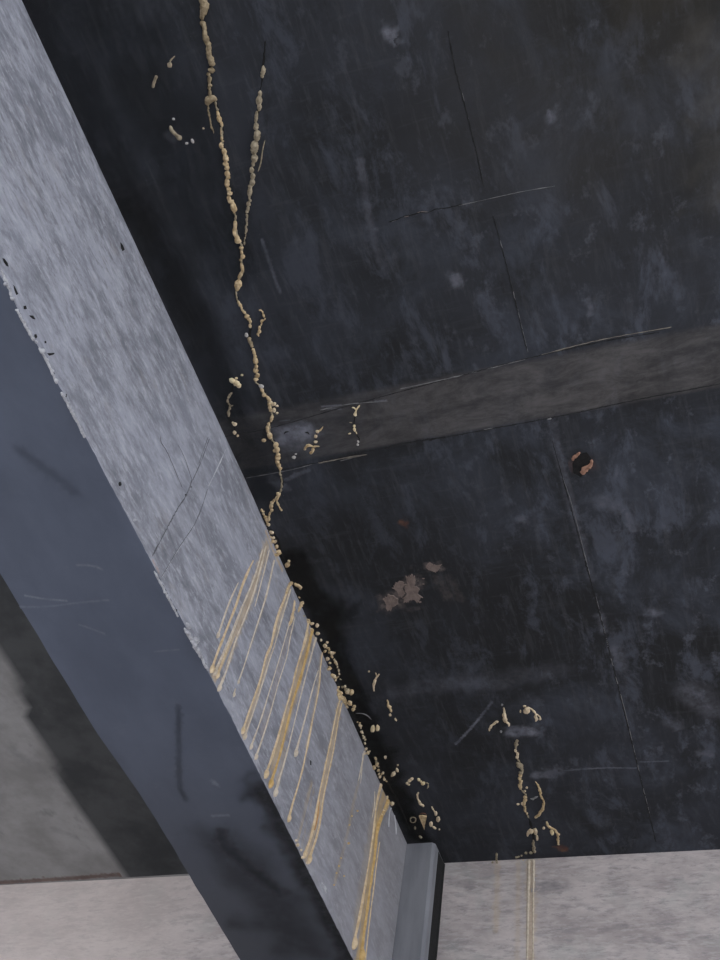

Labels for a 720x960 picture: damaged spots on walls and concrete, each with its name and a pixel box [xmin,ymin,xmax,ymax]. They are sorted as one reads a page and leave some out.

peeling [367,559,469,618]
water stain [262,512,579,842]
crack [151,0,719,854]
spalling [567,450,602,477]
water stain [587,488,645,536]
water stain [249,783,353,960]